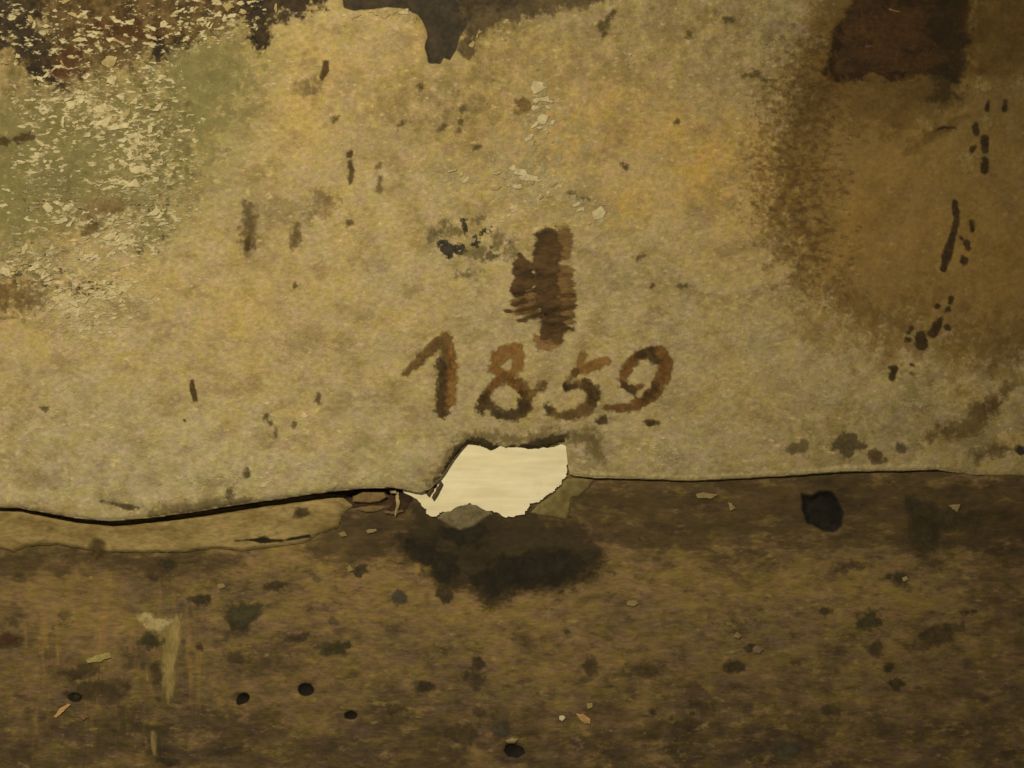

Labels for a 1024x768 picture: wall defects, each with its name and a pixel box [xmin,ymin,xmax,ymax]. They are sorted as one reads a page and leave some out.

peeling [0,0,327,350]
damp [768,0,1024,384]
crack [101,488,389,520]
flaking render [0,434,941,553]
damp [436,587,453,603]